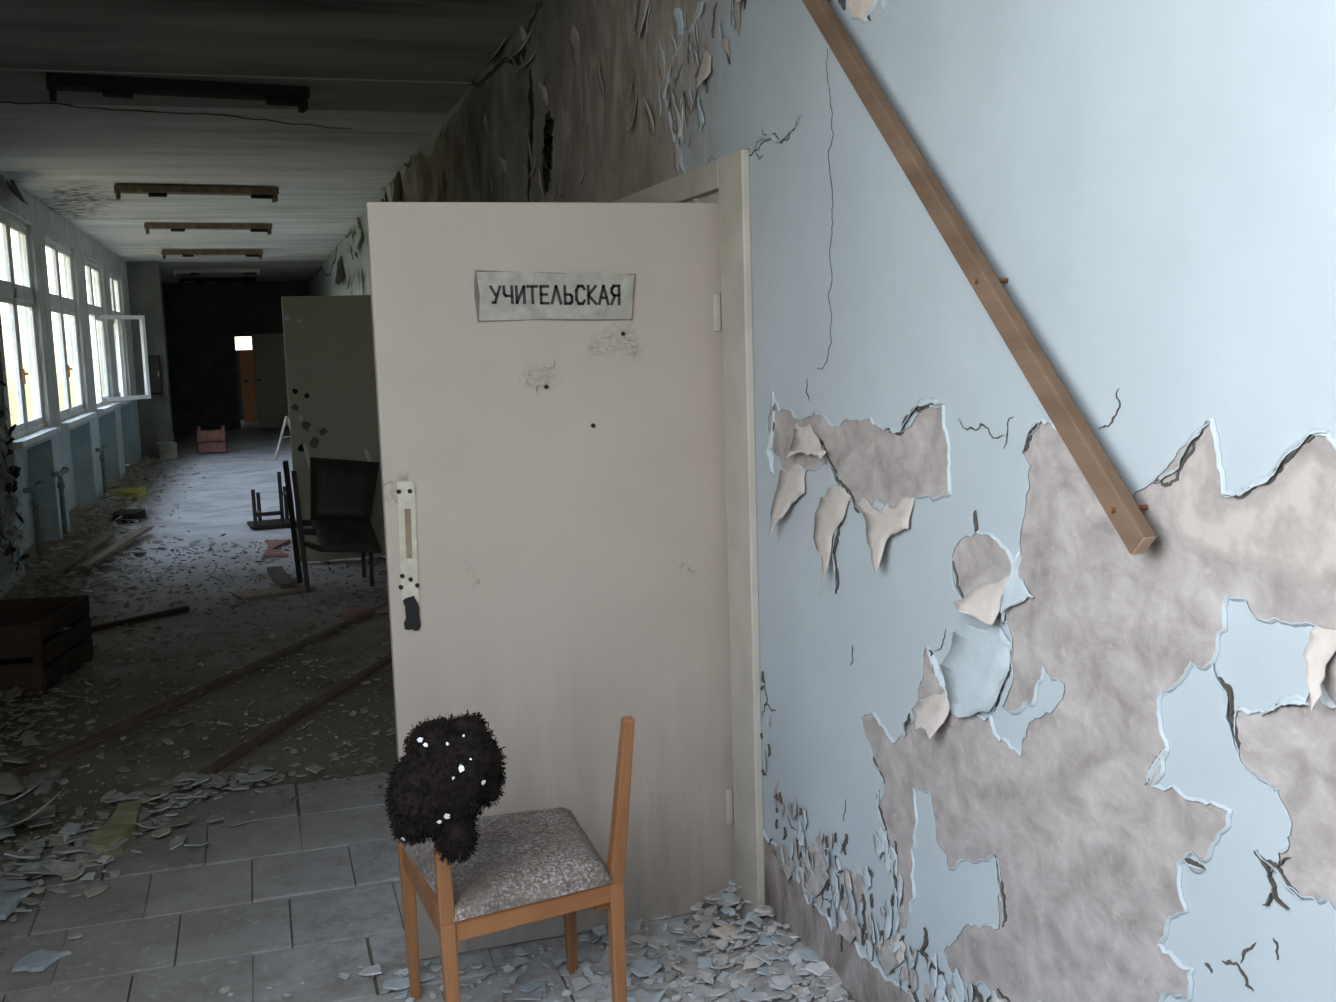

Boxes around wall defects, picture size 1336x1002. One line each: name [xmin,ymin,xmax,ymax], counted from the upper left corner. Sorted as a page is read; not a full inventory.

peeling [5,179,29,206]
peeling [335,216,367,295]
peeling [374,0,746,202]
crack [707,48,834,398]
peeling [847,0,877,23]
peeling [0,352,31,594]
peeling [758,391,1336,1002]